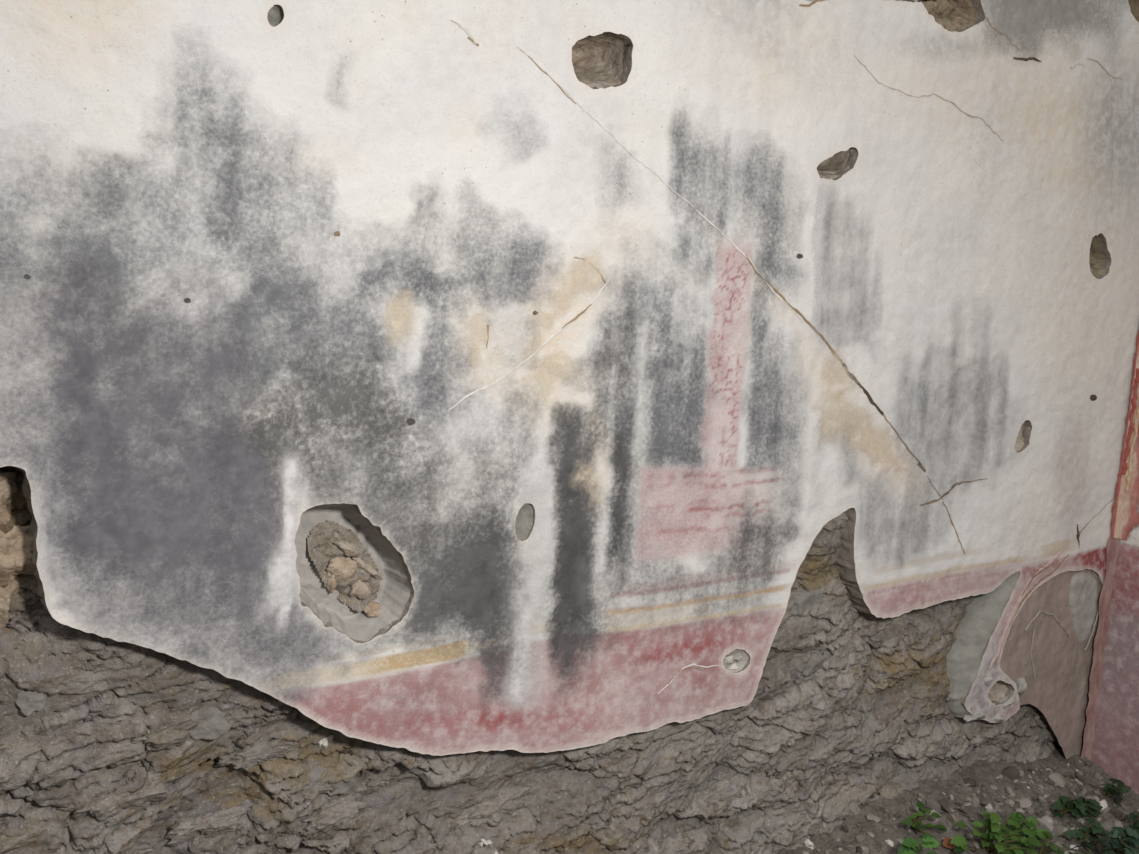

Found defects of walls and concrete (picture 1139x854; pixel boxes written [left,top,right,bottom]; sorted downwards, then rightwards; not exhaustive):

crack [452,20,479,46]
leakage [206,117,290,240]
leakage [0,165,597,705]
spalling [0,331,1139,854]
leakage [594,312,637,392]
leakage [610,411,633,588]
leakage [645,291,704,466]
leakage [718,526,797,589]
crack [517,46,1004,554]
leakage [748,368,796,465]